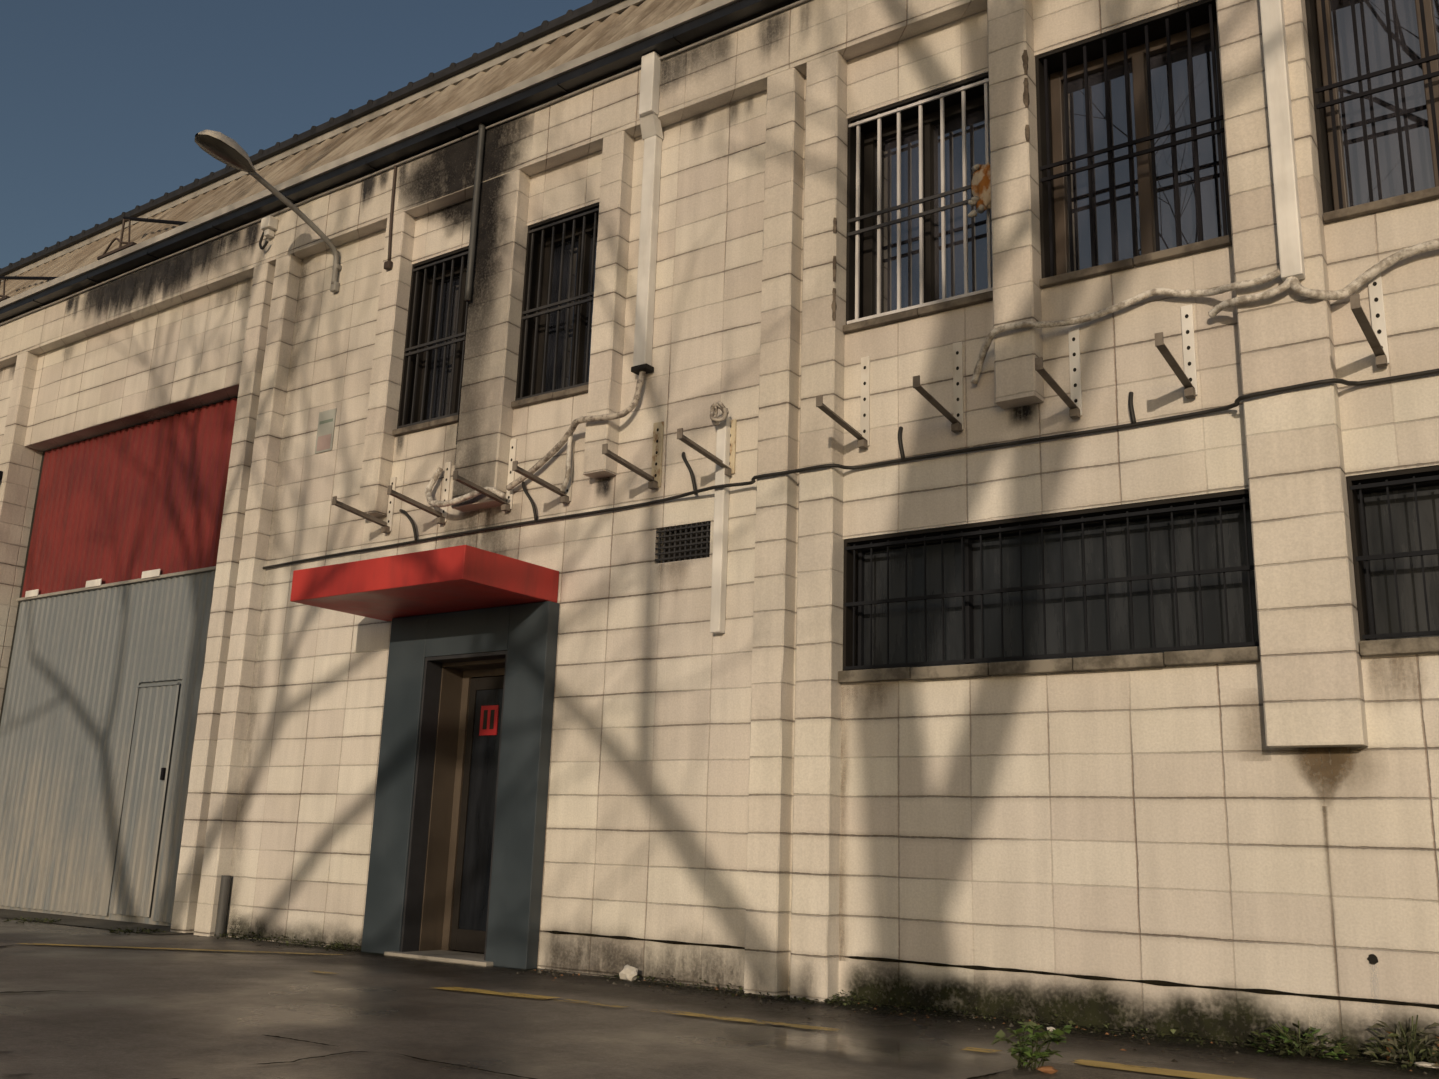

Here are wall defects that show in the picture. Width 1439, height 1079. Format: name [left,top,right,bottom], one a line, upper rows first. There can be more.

water stain [362,164,405,202]
water stain [67,223,258,314]
water stain [428,174,507,445]
crack [0,987,83,995]
crack [967,1070,1009,1079]
water stain [619,982,1439,1079]